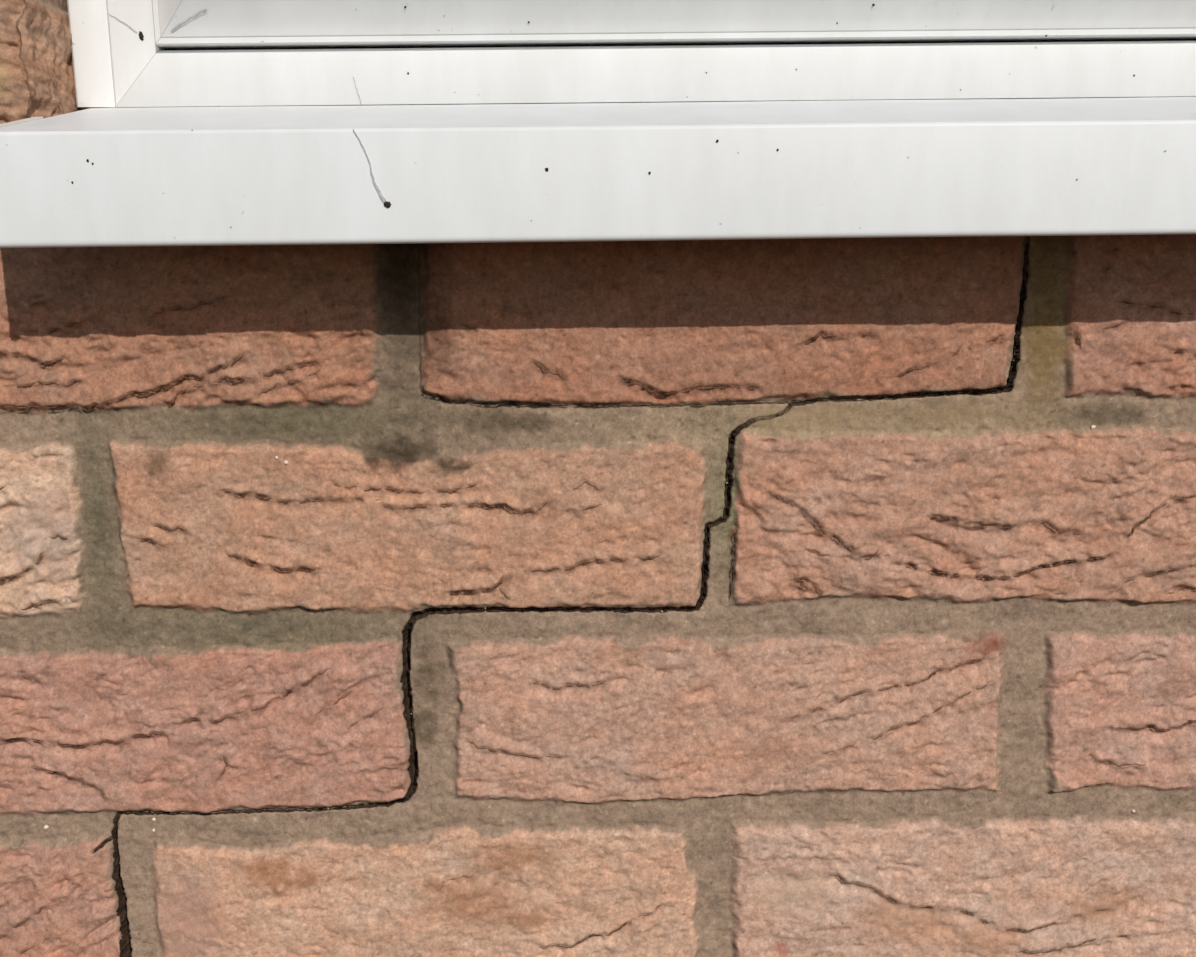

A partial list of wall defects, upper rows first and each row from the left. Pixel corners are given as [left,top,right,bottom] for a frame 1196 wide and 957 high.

crack [0,239,1029,957]
crack [831,875,1128,954]